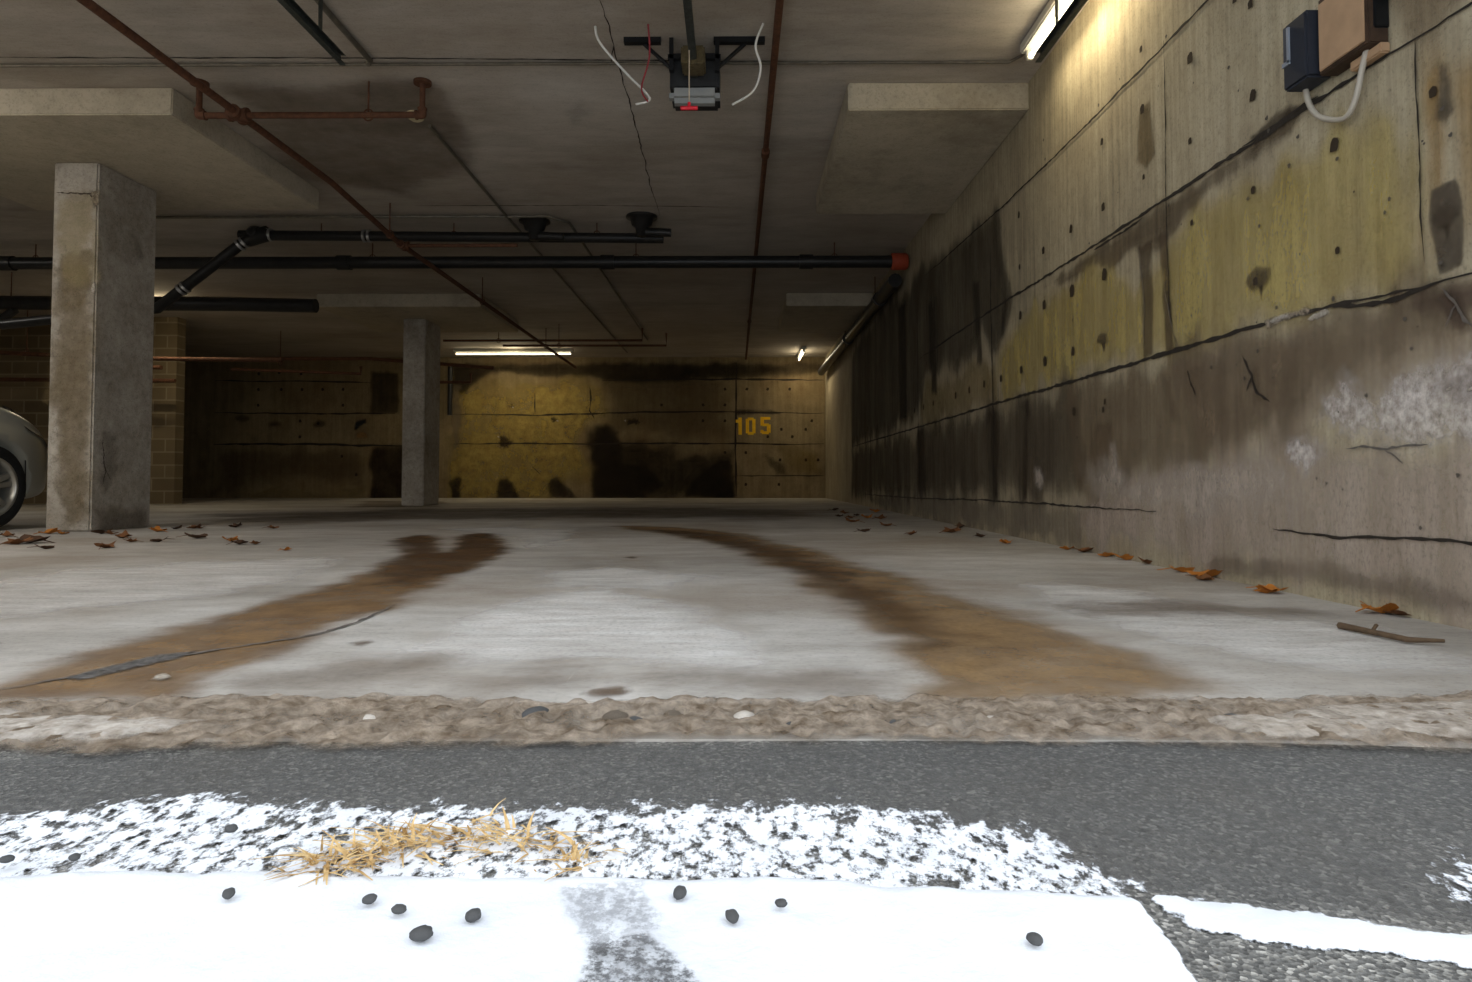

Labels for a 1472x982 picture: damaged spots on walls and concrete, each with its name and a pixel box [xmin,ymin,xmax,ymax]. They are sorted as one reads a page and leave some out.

water stain [1139,106,1152,163]
water stain [1430,180,1463,273]
water stain [245,363,819,547]
water stain [852,168,1340,558]
water stain [1327,362,1472,442]
water stain [1334,465,1472,613]